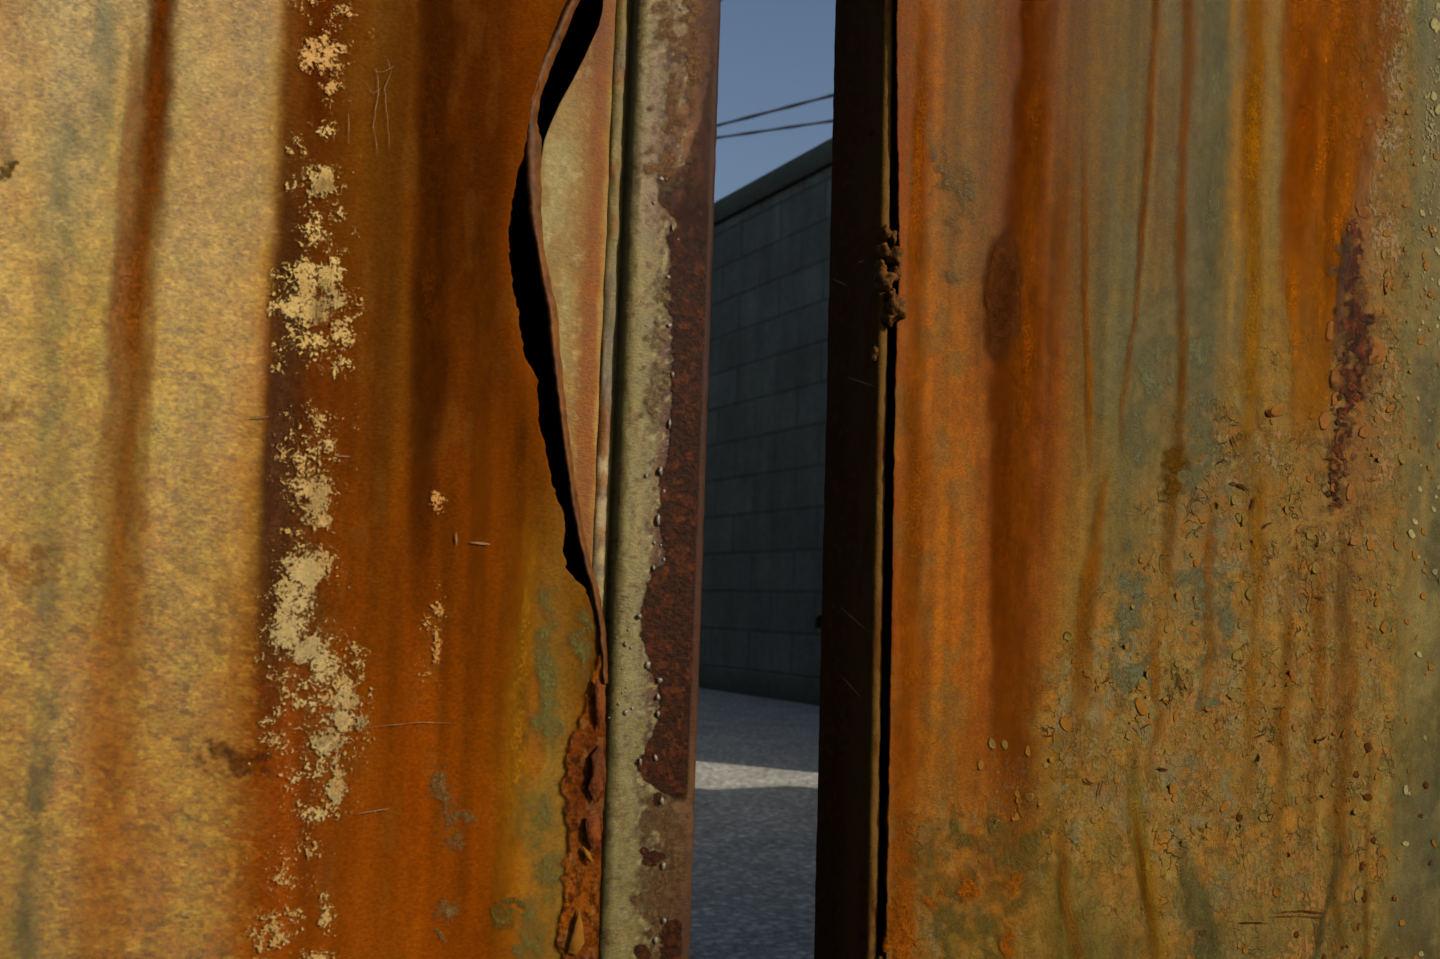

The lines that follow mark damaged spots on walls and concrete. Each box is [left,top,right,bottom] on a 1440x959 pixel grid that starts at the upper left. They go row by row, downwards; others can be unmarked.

corrosion [0,160,19,181]
corrosion [107,0,175,629]
peeling [267,0,367,379]
corrosion [644,0,706,181]
corrosion [985,234,1023,357]
corrosion [1162,172,1191,541]
corrosion [1243,0,1264,383]
corrosion [1283,0,1383,415]
peeling [246,400,376,959]
corrosion [557,654,606,959]
corrosion [630,796,685,959]
corrosion [1129,780,1164,959]